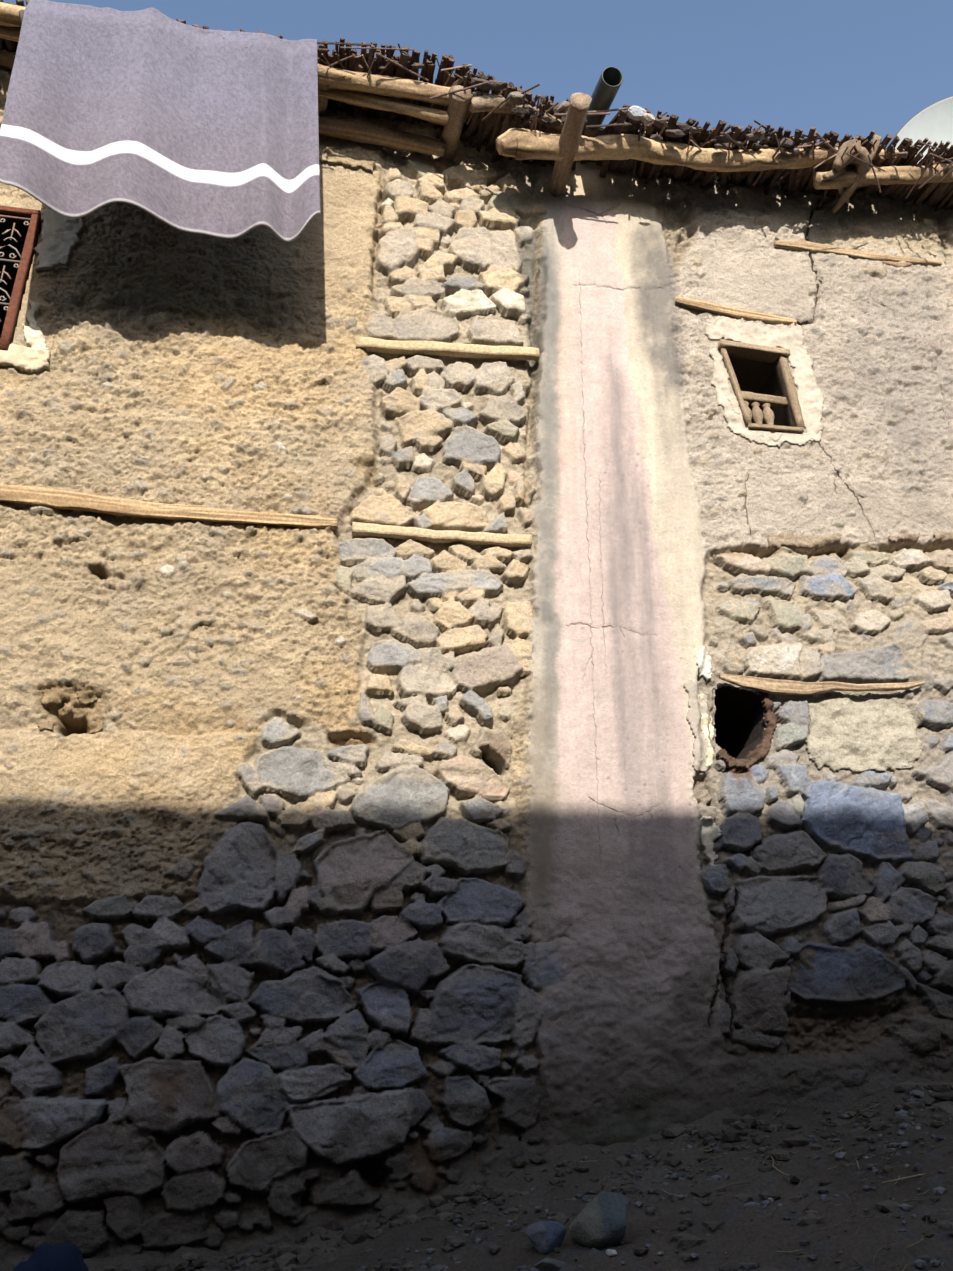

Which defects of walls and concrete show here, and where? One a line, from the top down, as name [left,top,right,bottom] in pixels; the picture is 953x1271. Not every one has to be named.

damp [521,235,538,301]
damp [643,252,678,382]
crack [797,200,830,326]
crack [797,433,876,541]
crack [566,274,669,870]
crack [708,888,738,1037]